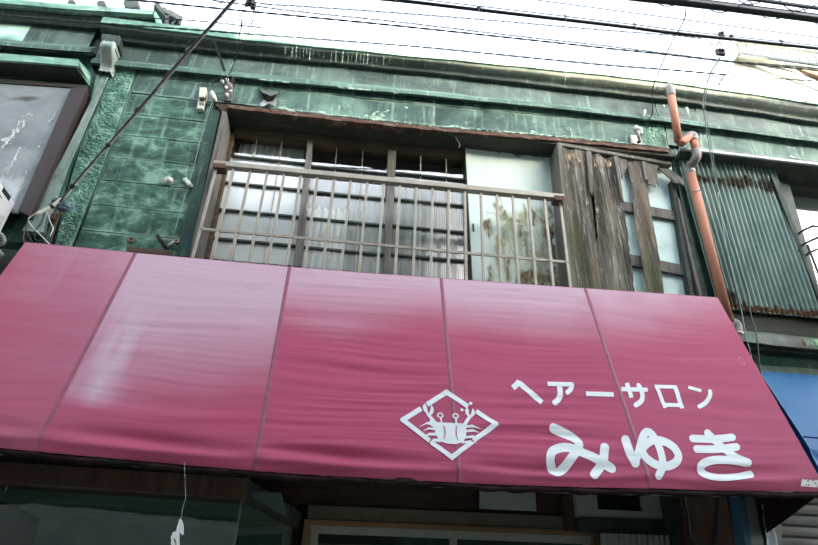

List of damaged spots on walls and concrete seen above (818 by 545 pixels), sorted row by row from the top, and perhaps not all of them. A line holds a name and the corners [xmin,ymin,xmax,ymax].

peeling [0,113,33,204]
rust [696,174,774,193]
rust [494,203,560,286]
rust [726,289,818,317]